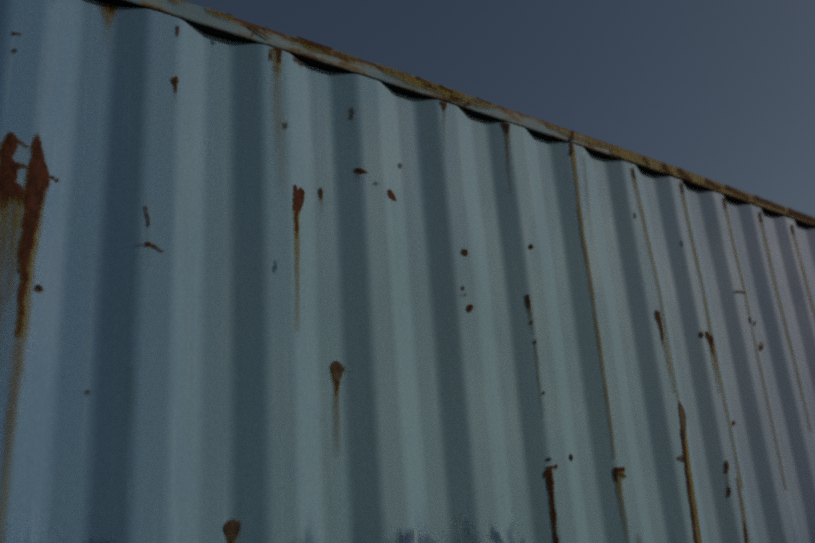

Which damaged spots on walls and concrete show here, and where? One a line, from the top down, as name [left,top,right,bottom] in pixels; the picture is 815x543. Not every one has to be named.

corrosion [250,25,282,69]
corrosion [378,63,496,110]
corrosion [0,132,59,377]
corrosion [293,184,305,270]
corrosion [549,125,815,303]
corrosion [331,361,345,395]
corrosion [224,519,241,543]
corrosion [544,458,559,543]
corrosion [614,467,626,501]
corrosion [677,402,702,543]